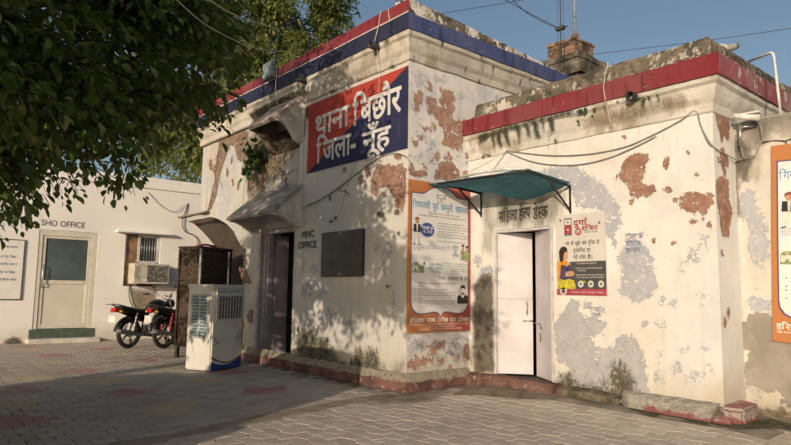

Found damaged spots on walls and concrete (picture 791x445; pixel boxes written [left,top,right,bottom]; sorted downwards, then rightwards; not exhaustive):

flaking render [207,130,249,211]
flaking render [358,81,469,217]
peeling [538,113,771,306]
water stain [297,328,382,371]
flaking render [407,339,469,372]
water stain [473,273,494,373]
peeling [553,299,648,393]
water stain [758,407,791,422]